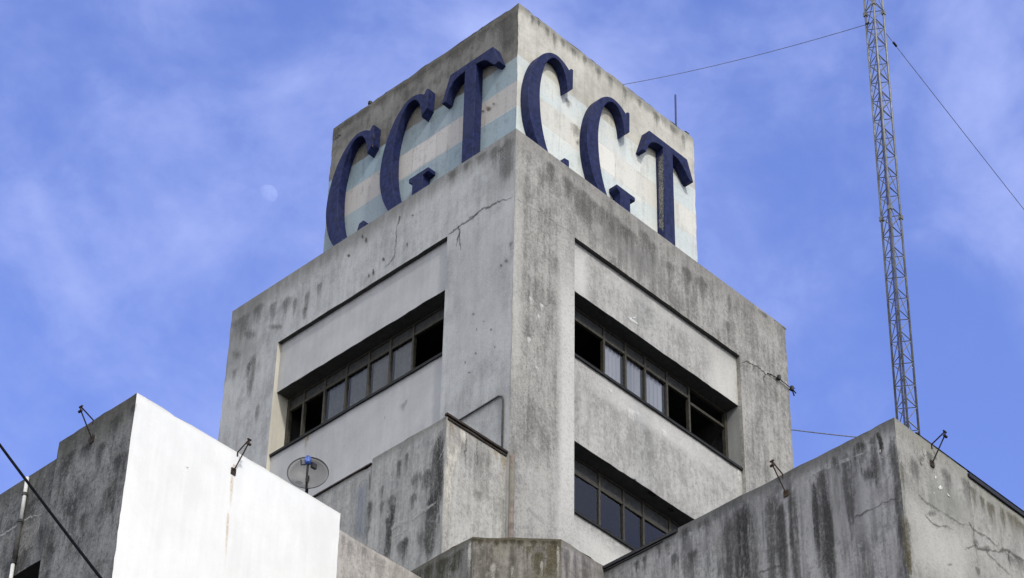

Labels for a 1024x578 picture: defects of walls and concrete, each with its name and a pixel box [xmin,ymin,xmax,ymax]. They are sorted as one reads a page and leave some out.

water stain [414,550,461,578]
water stain [412,430,467,551]
water stain [724,492,799,578]
water stain [813,438,877,578]
water stain [890,446,912,574]
crack [926,516,1023,570]